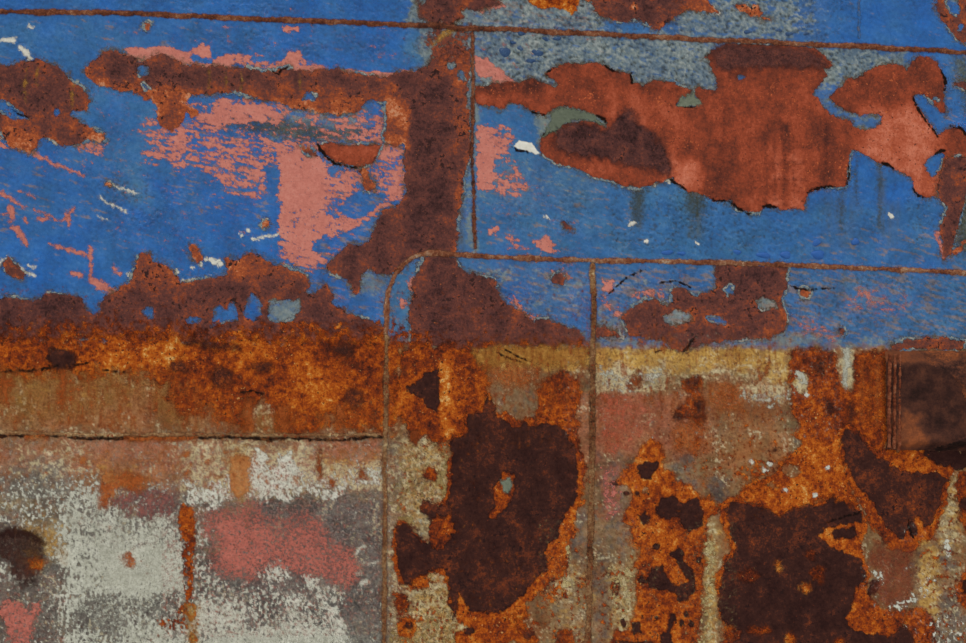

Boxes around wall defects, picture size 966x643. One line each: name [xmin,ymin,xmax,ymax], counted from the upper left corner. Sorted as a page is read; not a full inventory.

rust [528,0,721,31]
rust [933,0,966,46]
peeling [124,43,410,78]
peeling [474,43,966,216]
peeling [77,142,108,164]
peeling [138,97,406,273]
peeling [488,226,557,253]
peeling [175,257,223,282]
peeling [602,279,622,317]
rust [0,0,590,643]
peeling [740,370,808,409]
rust [592,259,966,643]